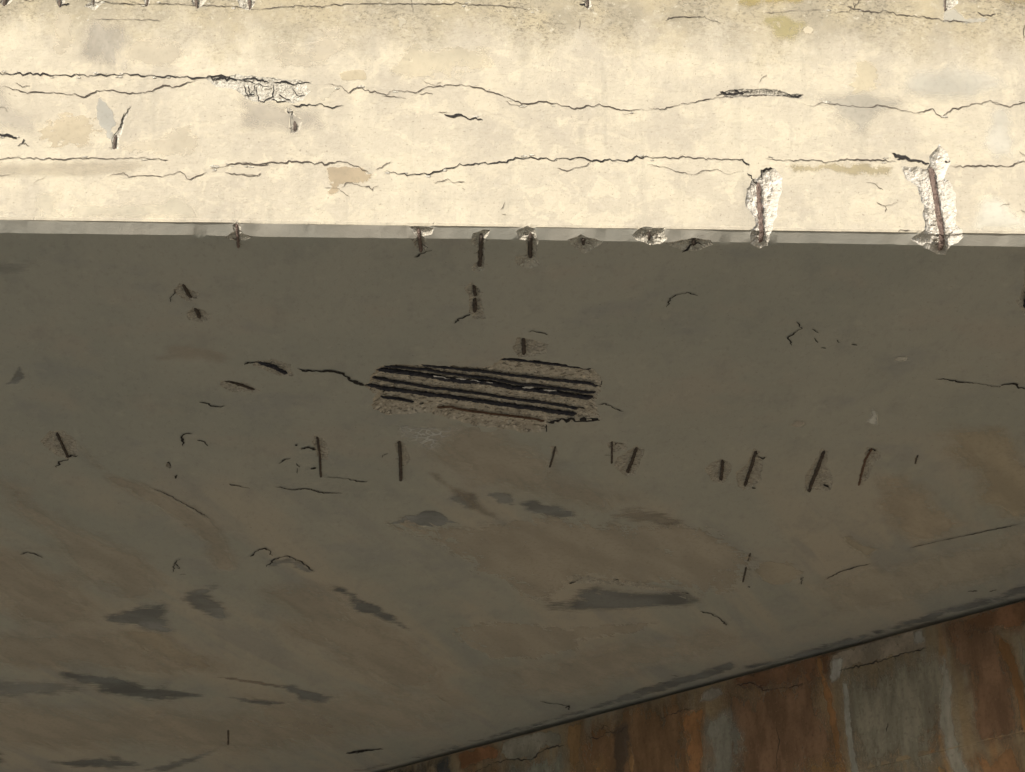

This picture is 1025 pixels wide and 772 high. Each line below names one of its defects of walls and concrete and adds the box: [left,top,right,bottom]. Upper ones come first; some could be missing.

crack [332,76,1025,120]
crack [0,71,908,232]
spalling [742,159,782,249]
spalling [892,144,964,255]
spalling [515,226,540,269]
crack [299,369,368,386]
spalling [365,337,622,433]
crack [935,378,1025,389]
leakage [107,605,170,632]
leakage [185,587,225,618]
leakage [334,588,404,627]
leakage [220,677,331,701]